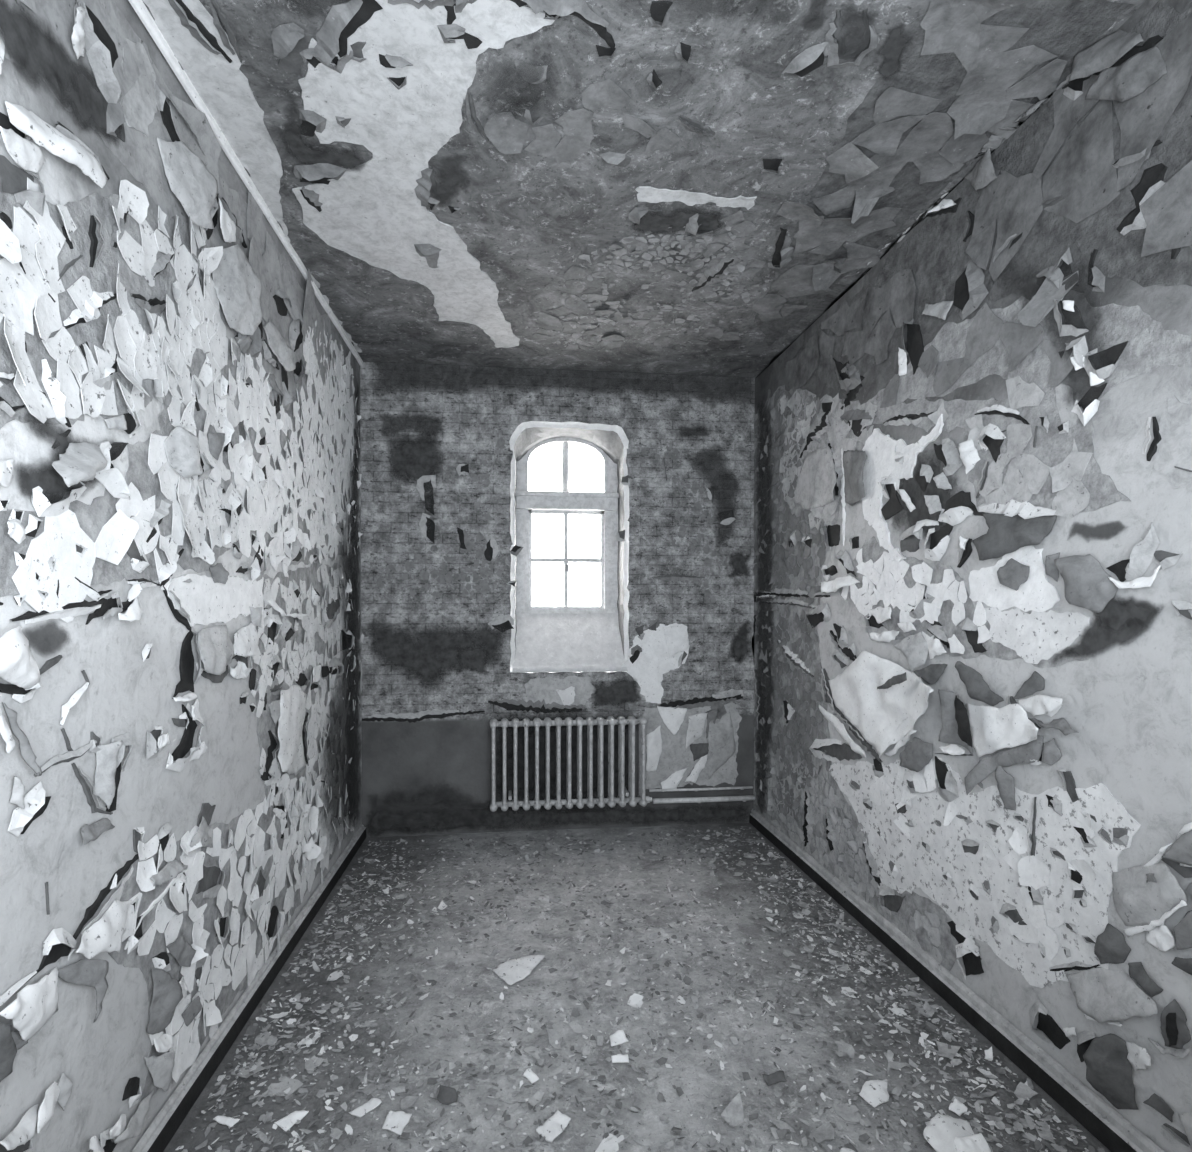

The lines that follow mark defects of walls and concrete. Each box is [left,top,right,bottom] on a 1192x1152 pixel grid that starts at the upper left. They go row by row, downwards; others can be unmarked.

peeling [0,0,523,1152]
leakage [324,386,749,835]
peeling [267,0,1192,1152]